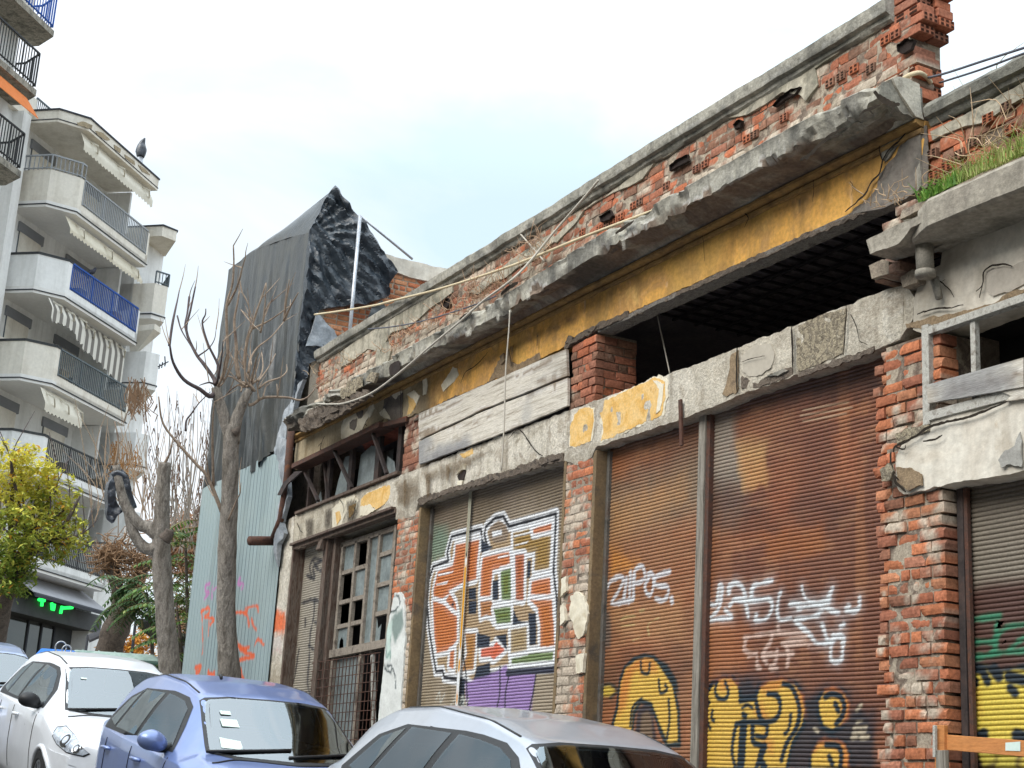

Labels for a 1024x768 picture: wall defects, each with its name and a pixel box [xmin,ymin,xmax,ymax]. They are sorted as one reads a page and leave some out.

spalling [772,86,802,108]
crack [800,90,906,212]
peeling [914,125,929,199]
spalling [564,134,906,349]
crack [917,263,1012,315]
peeling [417,374,669,505]
spalling [998,432,1023,468]
spalling [880,463,923,491]
peeling [331,485,391,528]
peeling [560,576,589,639]
peeling [576,653,587,674]